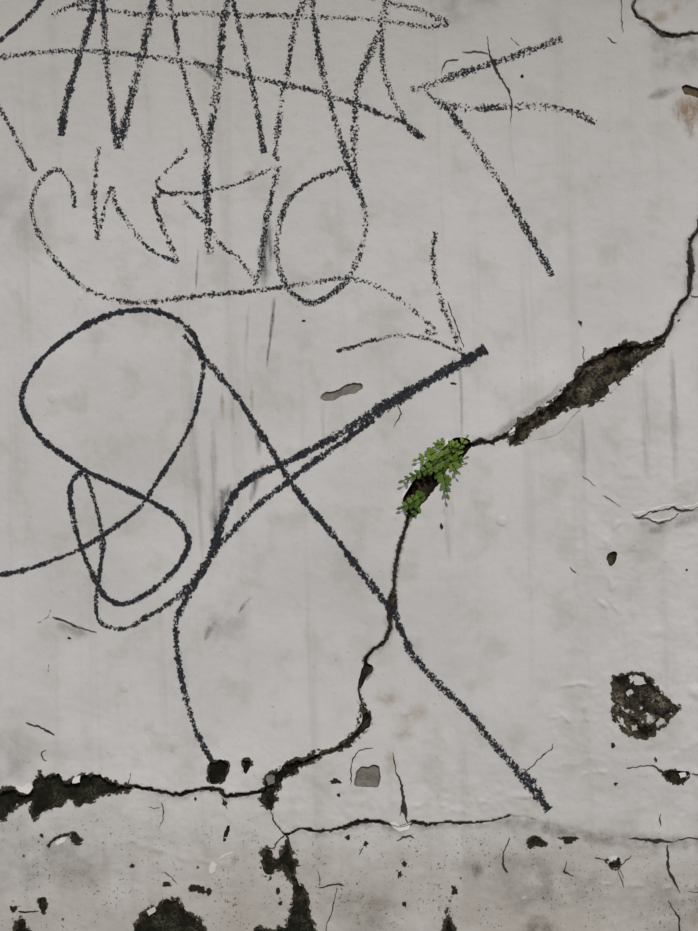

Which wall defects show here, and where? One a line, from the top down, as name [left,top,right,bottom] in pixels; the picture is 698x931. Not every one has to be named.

crack [608,0,698,43]
crack [655,229,698,344]
flaking render [320,383,363,401]
crack [471,432,515,446]
crack [363,515,410,662]
flaking render [610,671,682,740]
crack [26,722,54,780]
crack [519,744,553,777]
crack [628,757,664,775]
flaking render [0,770,134,822]
crack [125,755,510,873]
flaking render [133,896,207,931]